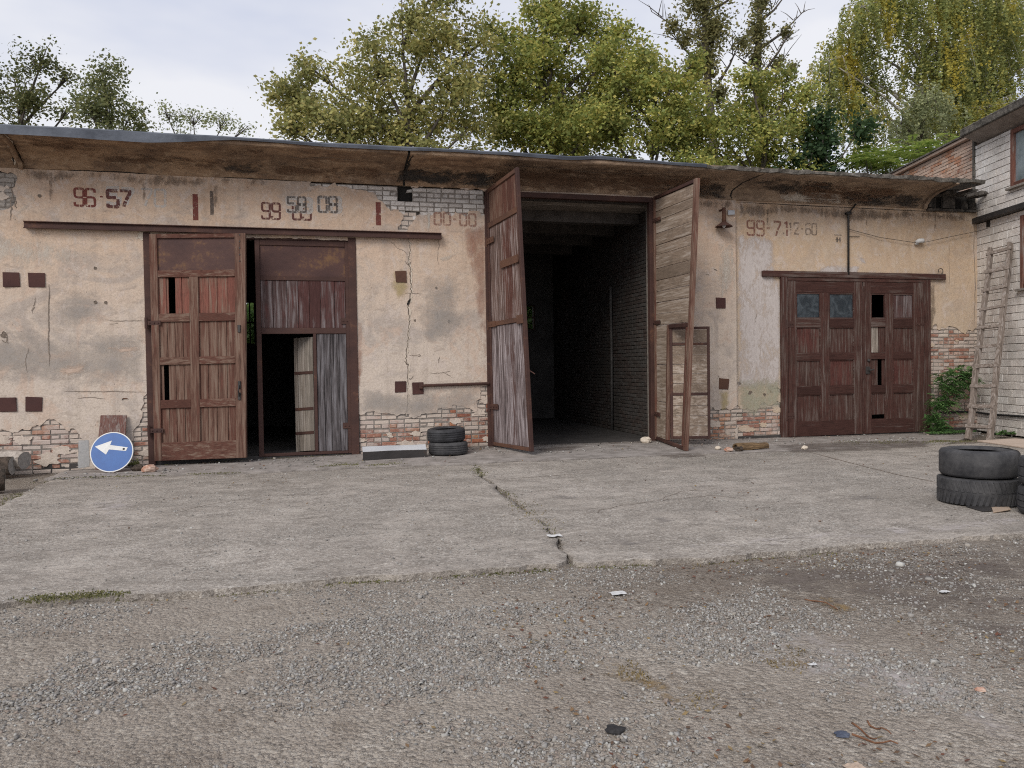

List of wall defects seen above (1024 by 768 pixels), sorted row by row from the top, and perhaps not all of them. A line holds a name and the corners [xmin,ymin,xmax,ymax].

spalling [0,173,17,210]
flaking render [309,183,484,232]
leakage [759,180,921,207]
crack [391,239,451,416]
peeling [703,236,780,439]
flaking render [931,324,977,428]
flaking render [0,419,83,475]
flaking render [359,386,488,454]